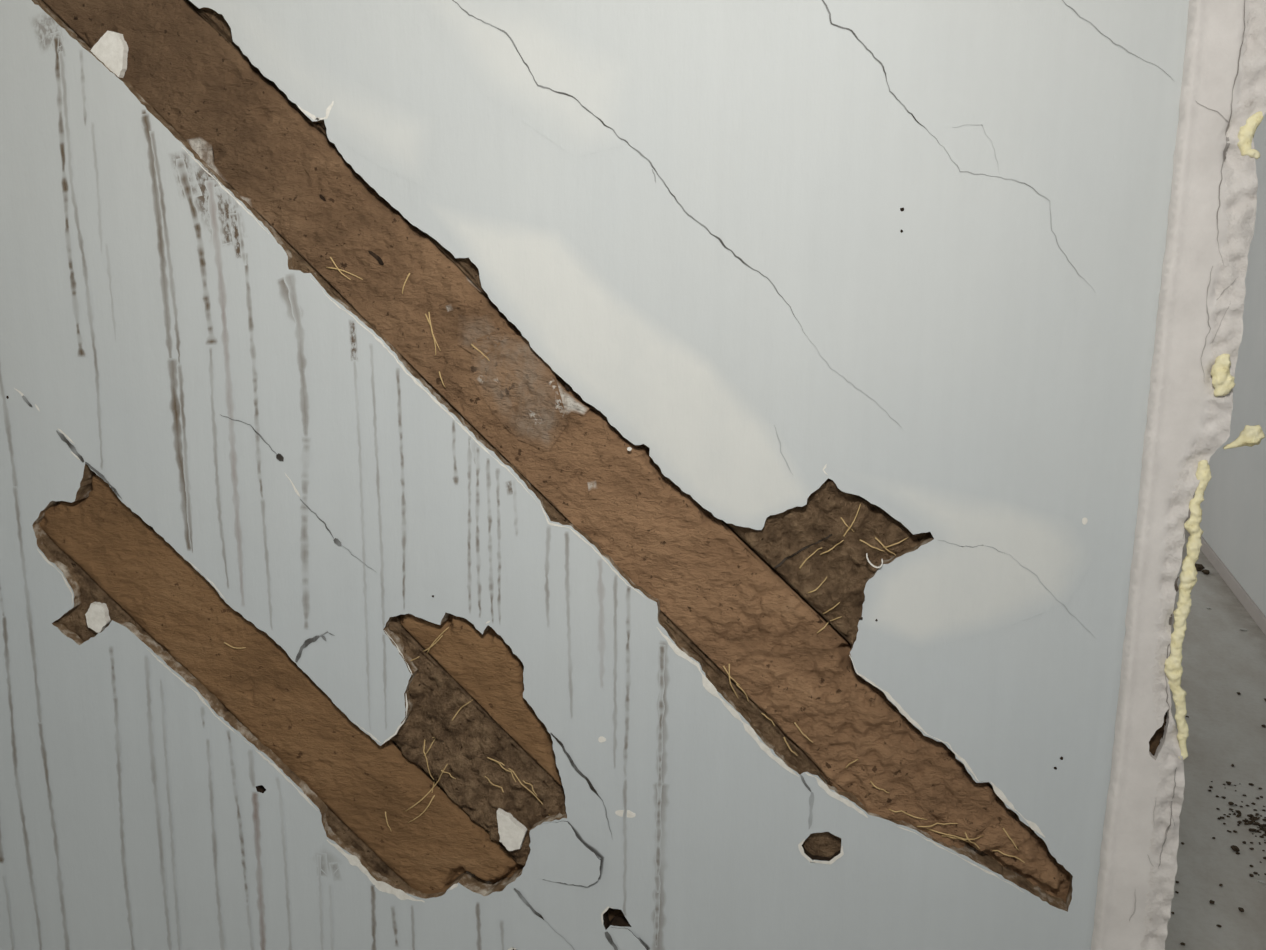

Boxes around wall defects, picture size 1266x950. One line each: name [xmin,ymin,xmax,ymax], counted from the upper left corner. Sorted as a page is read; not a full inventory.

leakage [0,359,70,950]
leakage [27,10,116,470]
leakage [140,109,273,631]
leakage [275,273,311,630]
leakage [451,420,519,625]
flaking render [37,0,1070,903]
crack [550,733,613,839]
flaking render [601,906,650,950]
crack [453,0,902,428]
crack [822,0,1096,293]
flaking render [1149,712,1167,755]
crack [1196,0,1245,382]